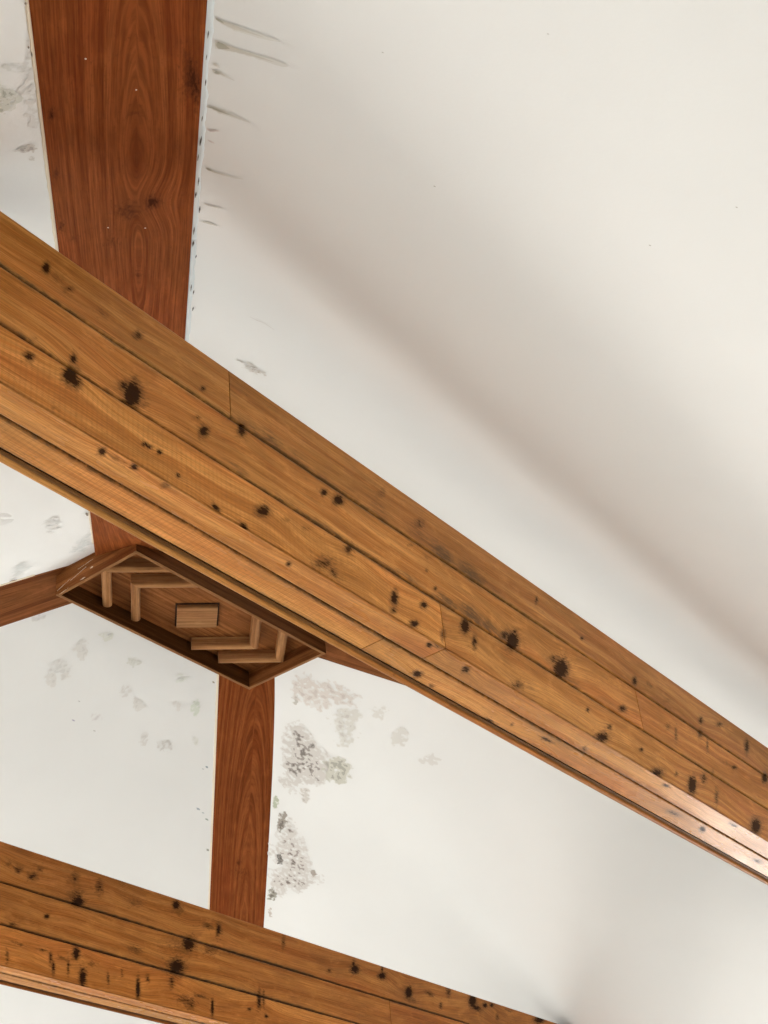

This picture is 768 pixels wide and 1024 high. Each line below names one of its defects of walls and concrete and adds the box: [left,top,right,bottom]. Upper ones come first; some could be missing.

mould [267,672,410,921]